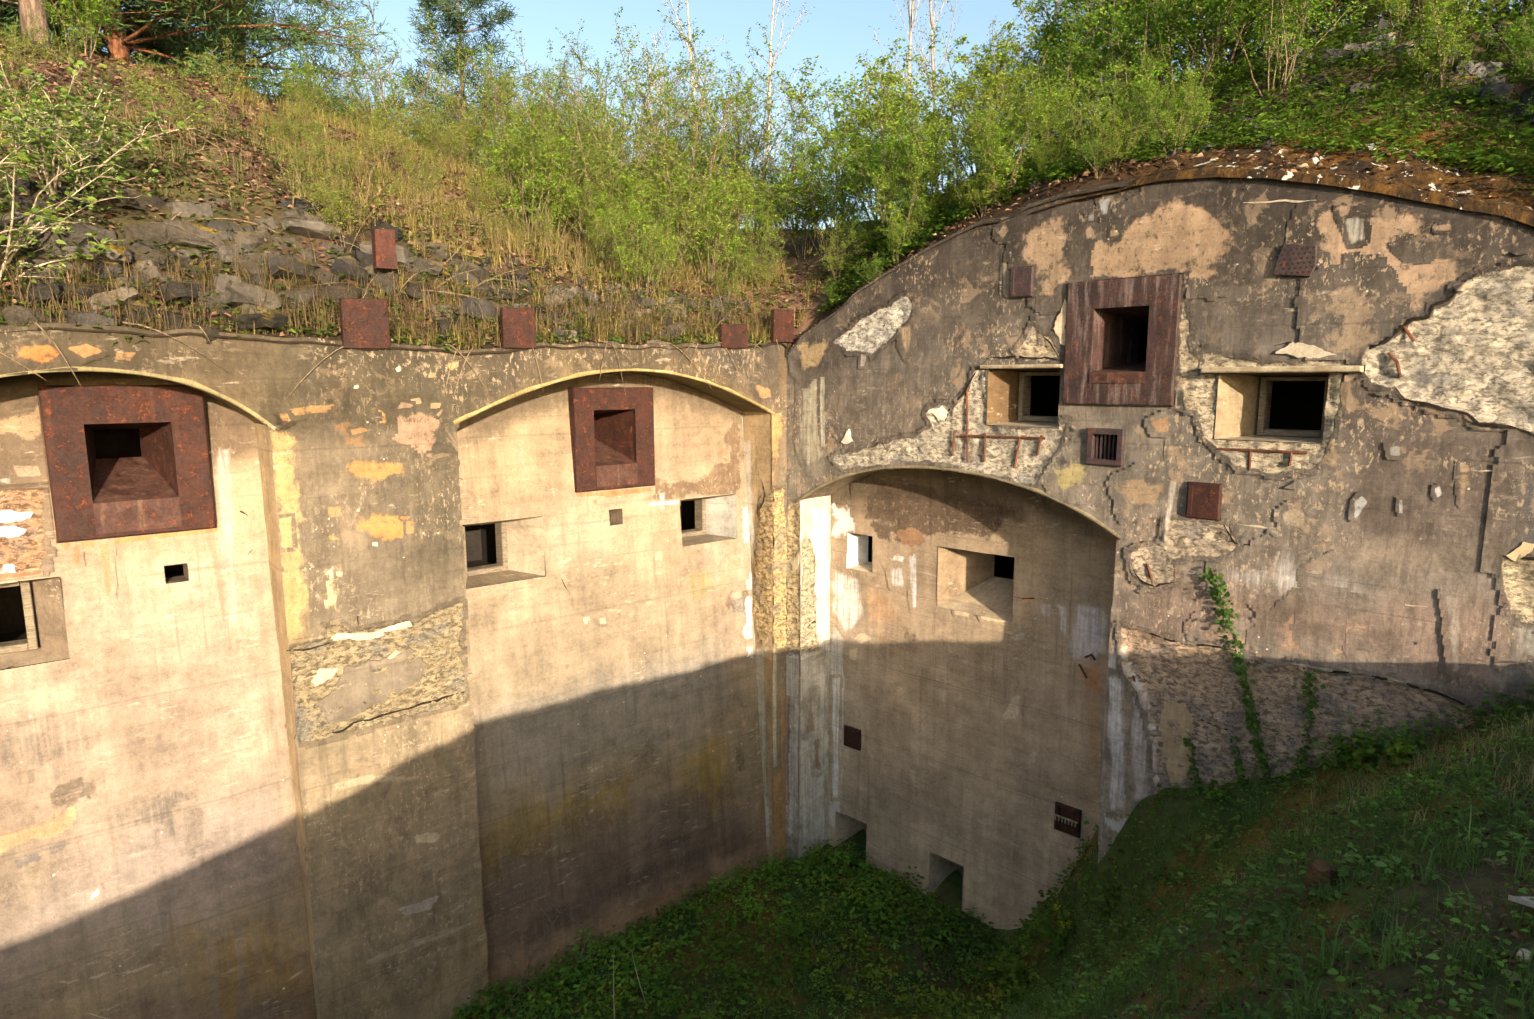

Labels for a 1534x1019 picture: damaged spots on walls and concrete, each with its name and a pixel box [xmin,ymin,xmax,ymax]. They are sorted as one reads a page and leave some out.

spalling [0,378,73,581]
spalling [257,351,477,749]
peeling [634,378,819,661]
spalling [787,290,916,389]
spalling [828,168,1534,594]
spalling [1112,582,1508,797]
spalling [1492,542,1534,634]
spalling [85,883,106,906]
peeling [0,755,212,894]